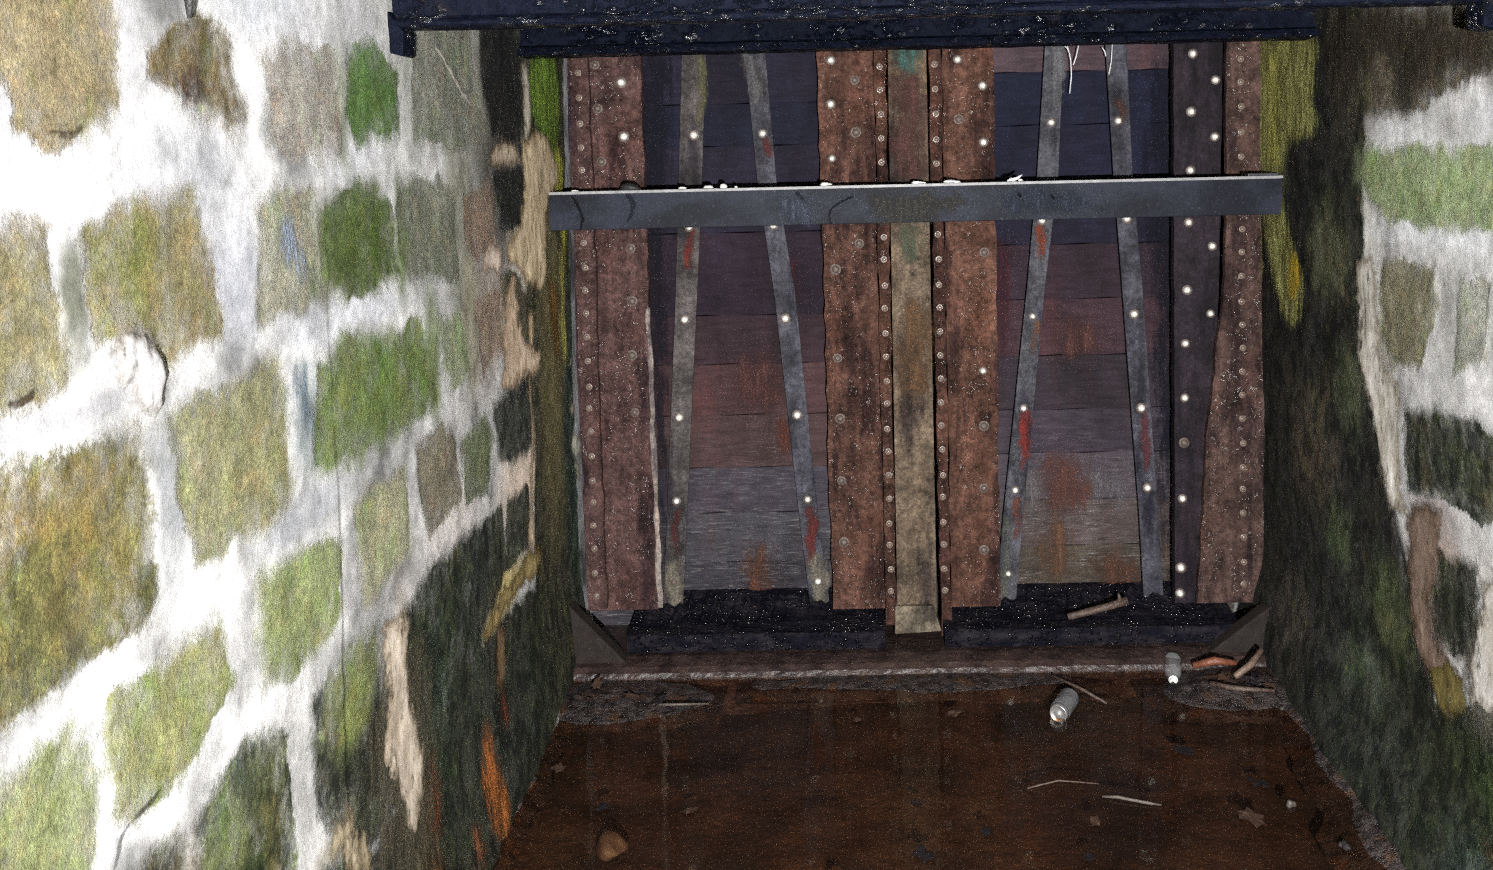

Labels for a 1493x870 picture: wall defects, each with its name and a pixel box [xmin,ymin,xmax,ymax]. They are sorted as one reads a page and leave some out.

corrosion [474,730,511,860]